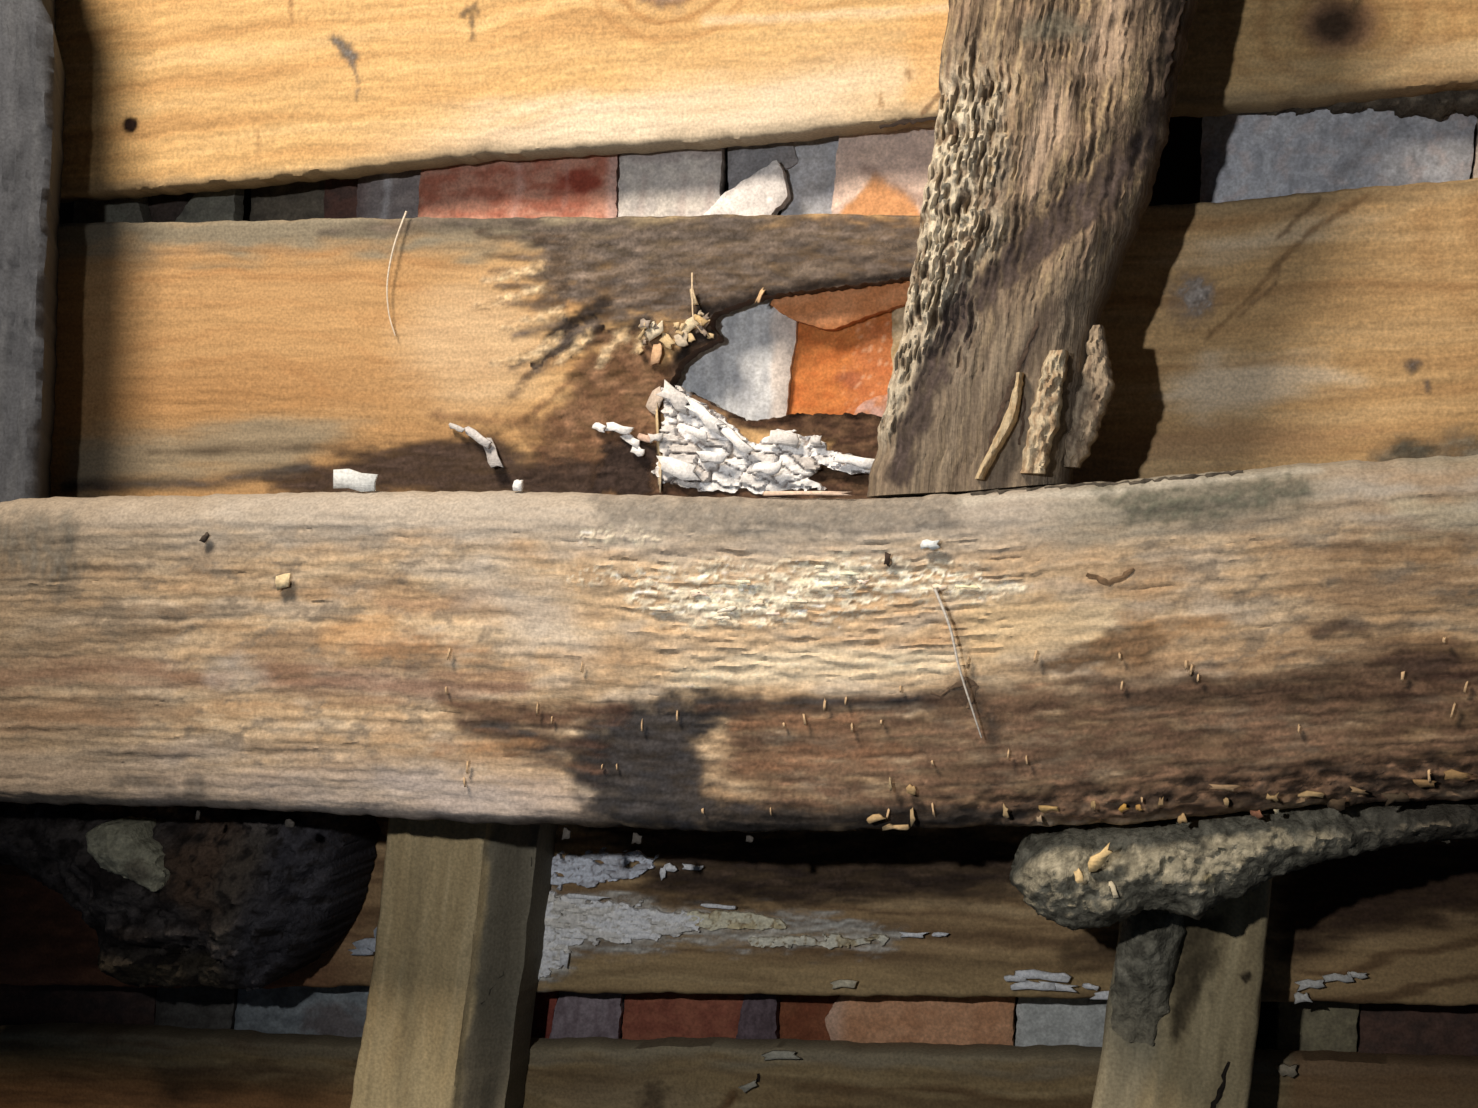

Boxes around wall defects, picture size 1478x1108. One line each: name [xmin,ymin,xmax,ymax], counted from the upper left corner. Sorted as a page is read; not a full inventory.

peeling [592,380,874,481]
peeling [571,552,1025,629]
leakage [439,626,1478,908]
peeling [551,847,704,900]
peeling [687,903,949,949]
leakage [1278,844,1478,954]